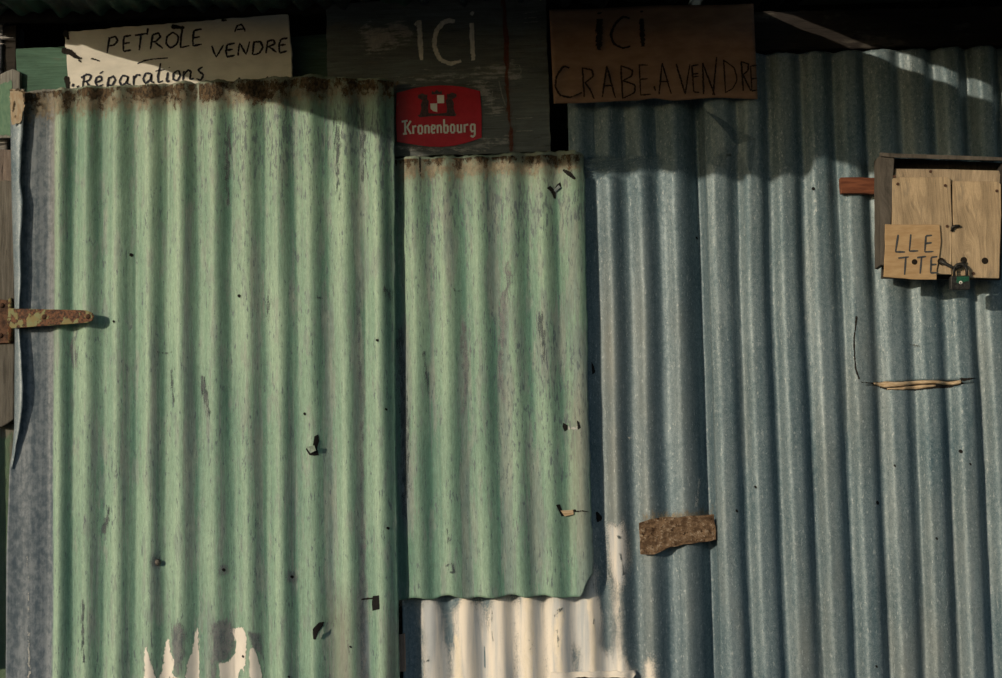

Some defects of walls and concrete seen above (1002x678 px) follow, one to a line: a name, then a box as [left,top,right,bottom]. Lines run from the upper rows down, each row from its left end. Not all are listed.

rust [24,76,400,132]
crack [852,316,860,379]
peeling [144,617,264,678]